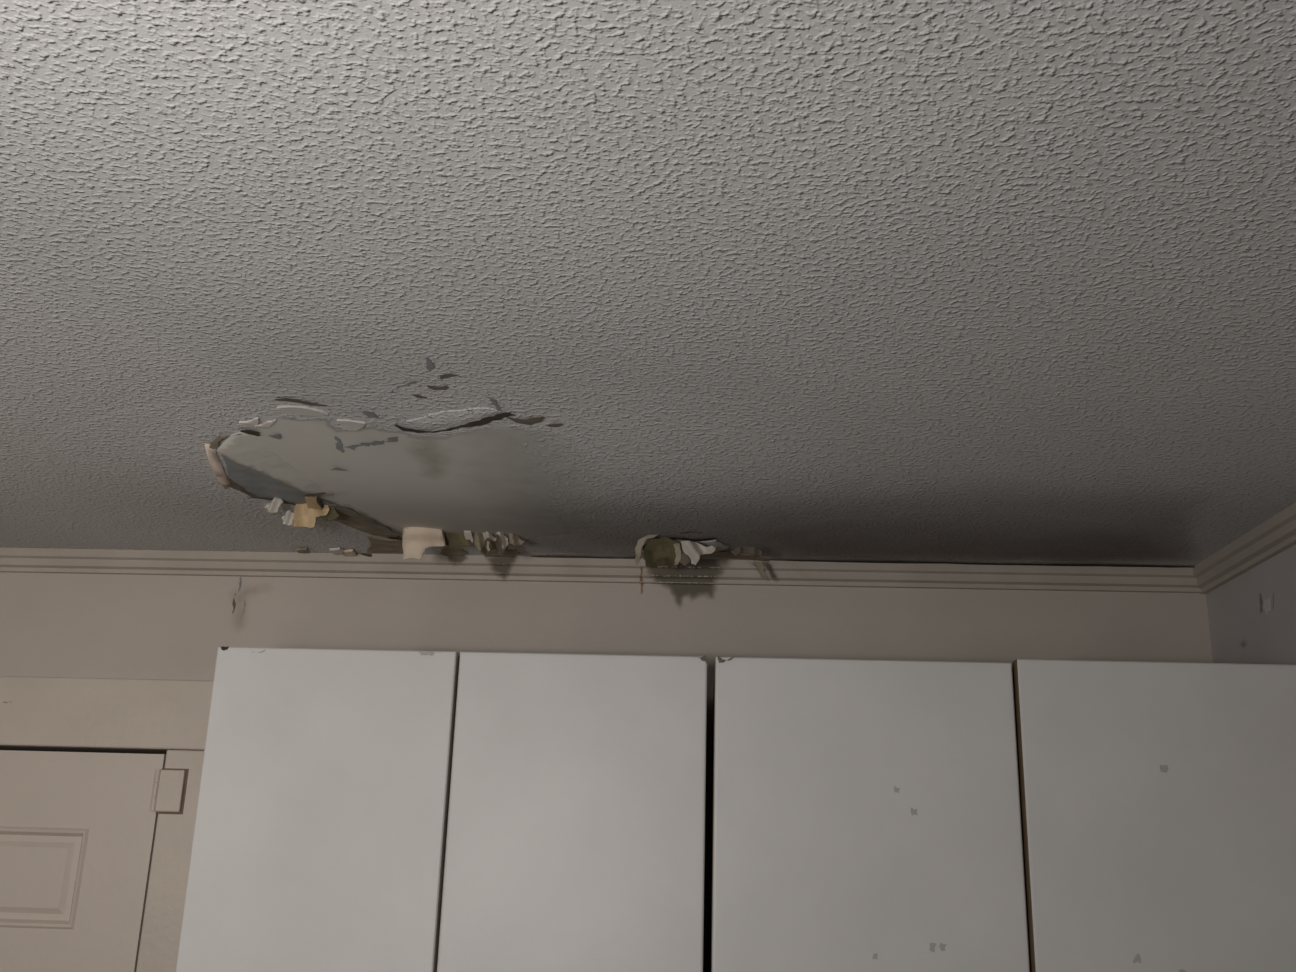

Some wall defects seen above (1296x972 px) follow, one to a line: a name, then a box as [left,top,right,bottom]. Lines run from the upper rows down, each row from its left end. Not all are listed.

crack [391,358,563,433]
peeling [205,398,560,560]
peeling [635,531,771,580]